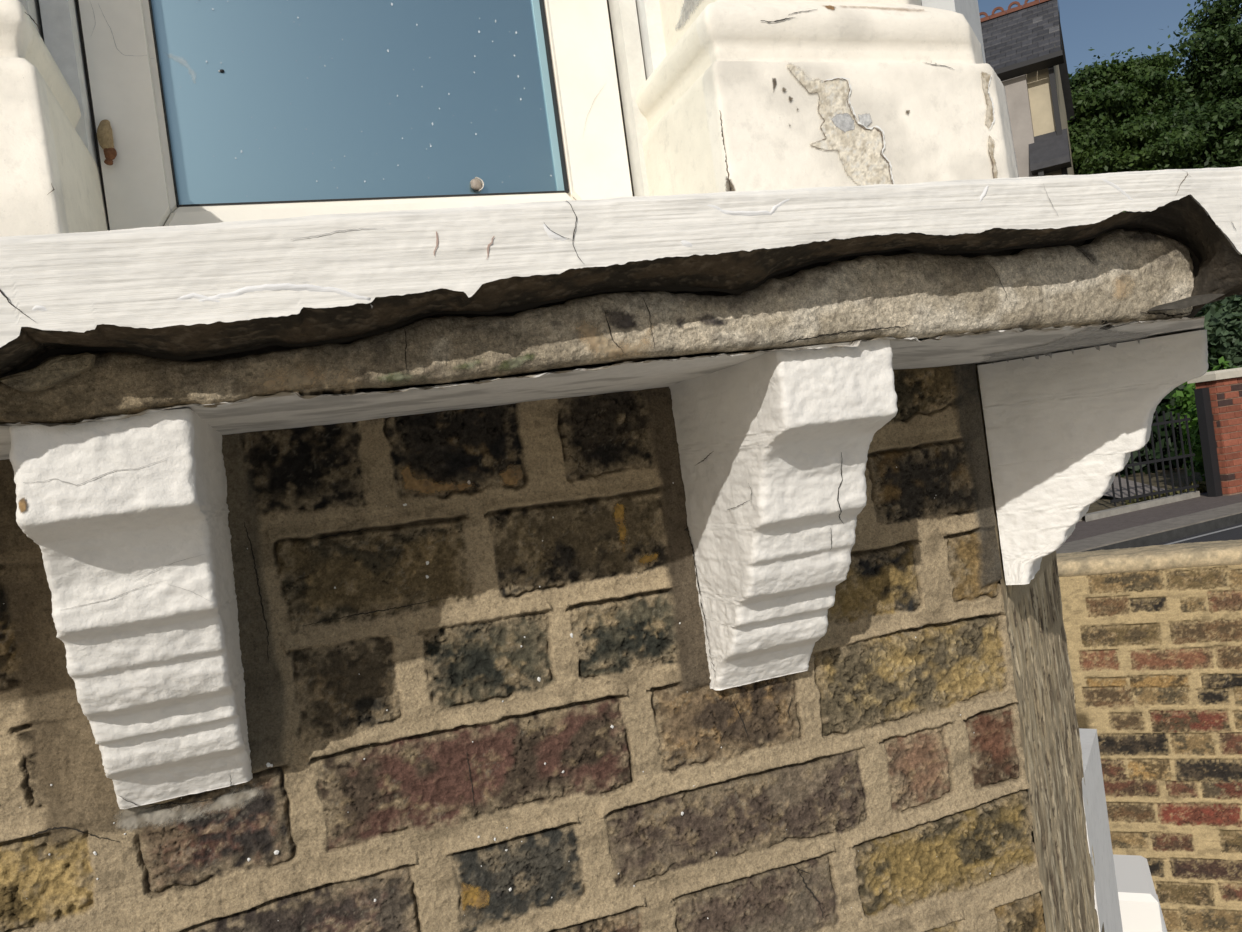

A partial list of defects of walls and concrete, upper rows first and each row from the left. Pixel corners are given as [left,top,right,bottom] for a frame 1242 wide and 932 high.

peeling [772,64,894,186]
peeling [981,72,998,179]
crack [0,187,1193,378]
spalling [0,195,1242,392]
crack [23,456,171,486]
crack [831,452,844,549]